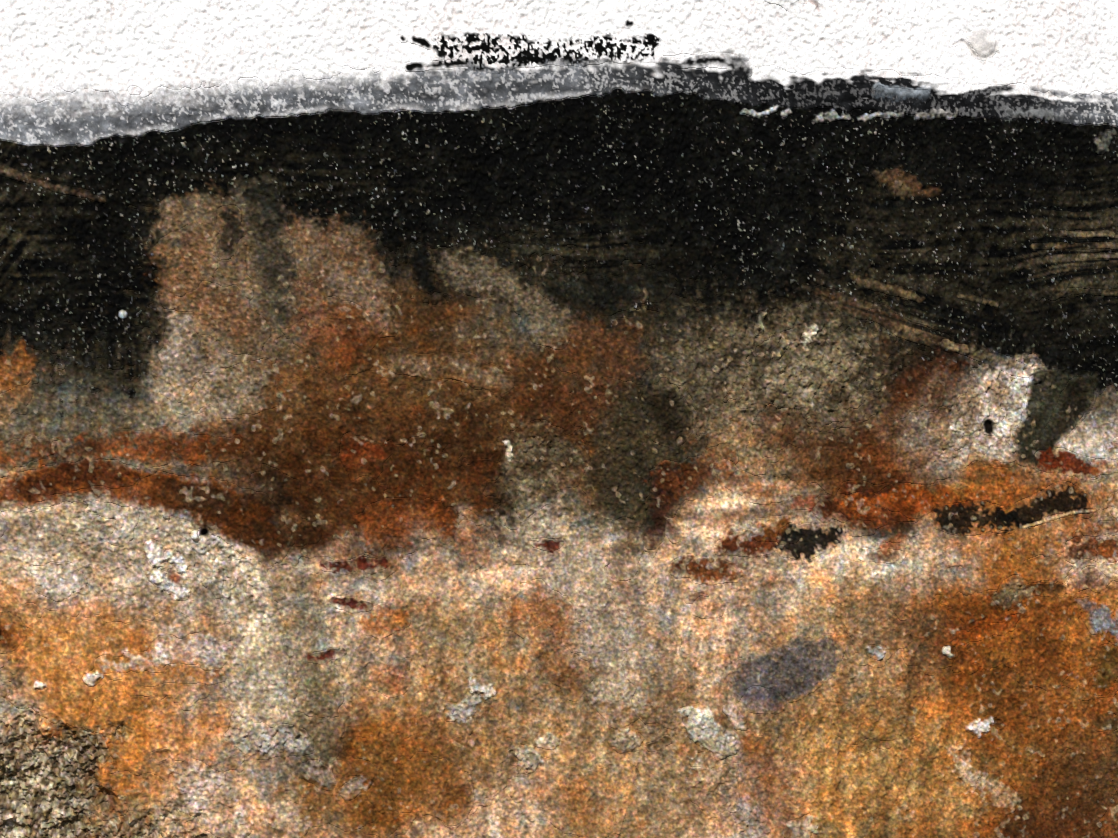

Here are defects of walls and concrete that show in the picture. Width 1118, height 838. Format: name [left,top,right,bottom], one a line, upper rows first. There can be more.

leakage [214,171,303,329]
corrosion [0,310,650,583]
corrosion [650,351,1118,701]
corrosion [0,581,245,782]
corrosion [495,579,594,702]
corrosion [285,718,629,838]
corrosion [735,726,811,838]